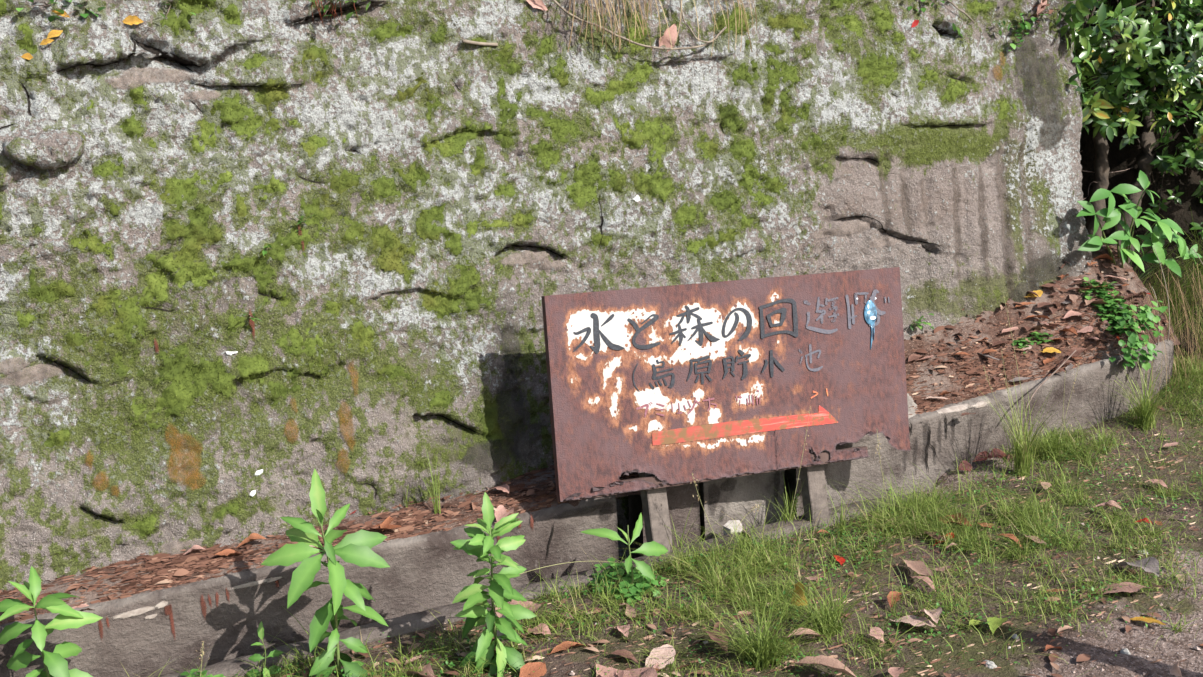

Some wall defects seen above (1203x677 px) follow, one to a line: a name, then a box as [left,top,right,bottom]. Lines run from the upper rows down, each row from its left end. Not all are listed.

crack [0,36,266,129]
crack [837,216,951,258]
crack [419,415,483,435]
corrosion [201,588,229,619]
corrosion [165,605,175,638]